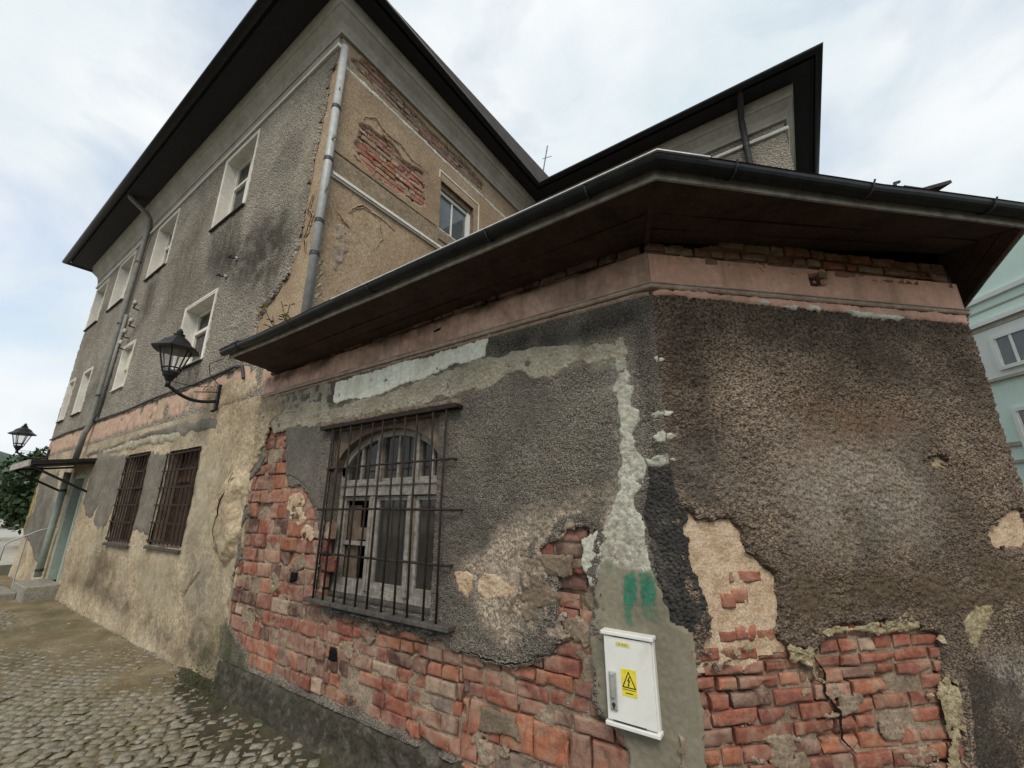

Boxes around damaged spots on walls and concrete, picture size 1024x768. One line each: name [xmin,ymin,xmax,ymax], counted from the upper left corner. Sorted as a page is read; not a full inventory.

flaking render [354,125,429,207]
flaking render [49,243,953,455]
flaking render [227,423,630,768]
flaking render [672,502,967,768]
crack [812,657,858,755]
flaking render [988,510,1024,555]